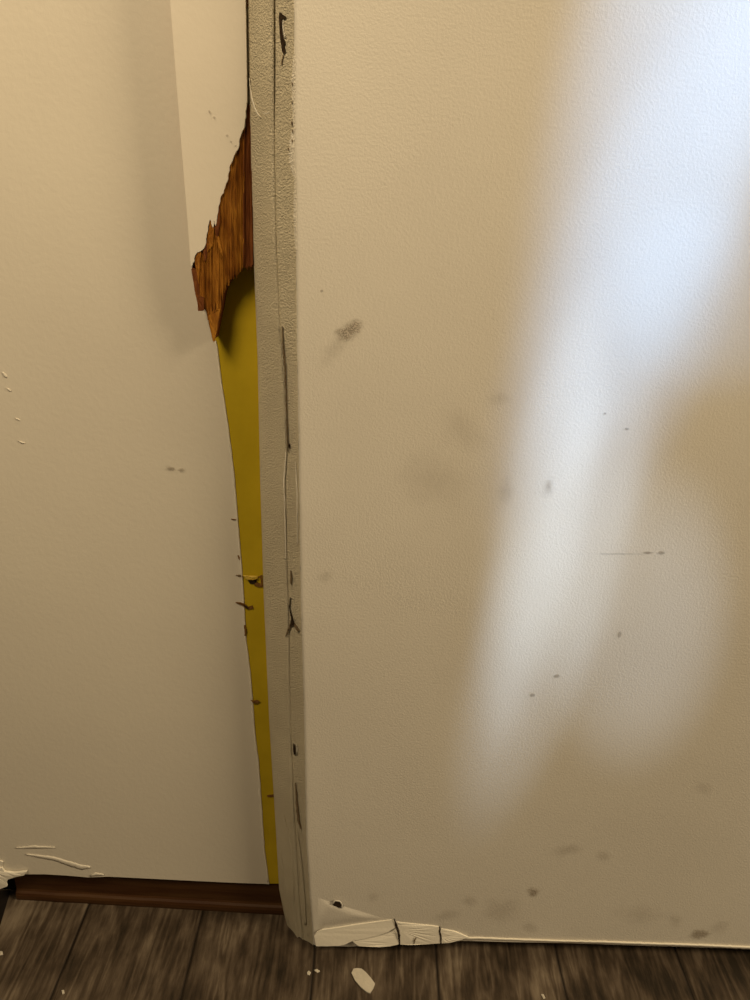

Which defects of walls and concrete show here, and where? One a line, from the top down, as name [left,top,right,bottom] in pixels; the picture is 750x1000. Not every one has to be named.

crack [282,327,299,636]
peeling [0,860,28,889]
peeling [314,919,468,947]